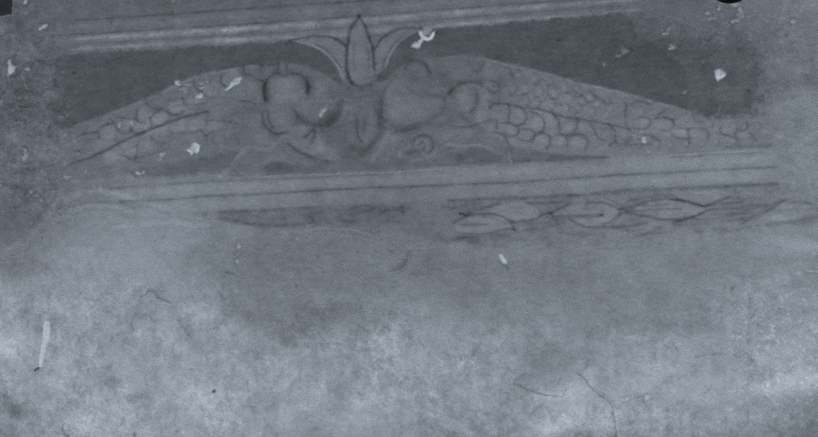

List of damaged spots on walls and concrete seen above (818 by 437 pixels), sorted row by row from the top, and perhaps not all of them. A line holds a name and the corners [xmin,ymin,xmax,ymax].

peeling [410,24,437,51]
peeling [5,58,32,78]
peeling [222,75,244,93]
peeling [713,67,728,84]
peeling [185,141,202,156]
crack [513,370,643,437]